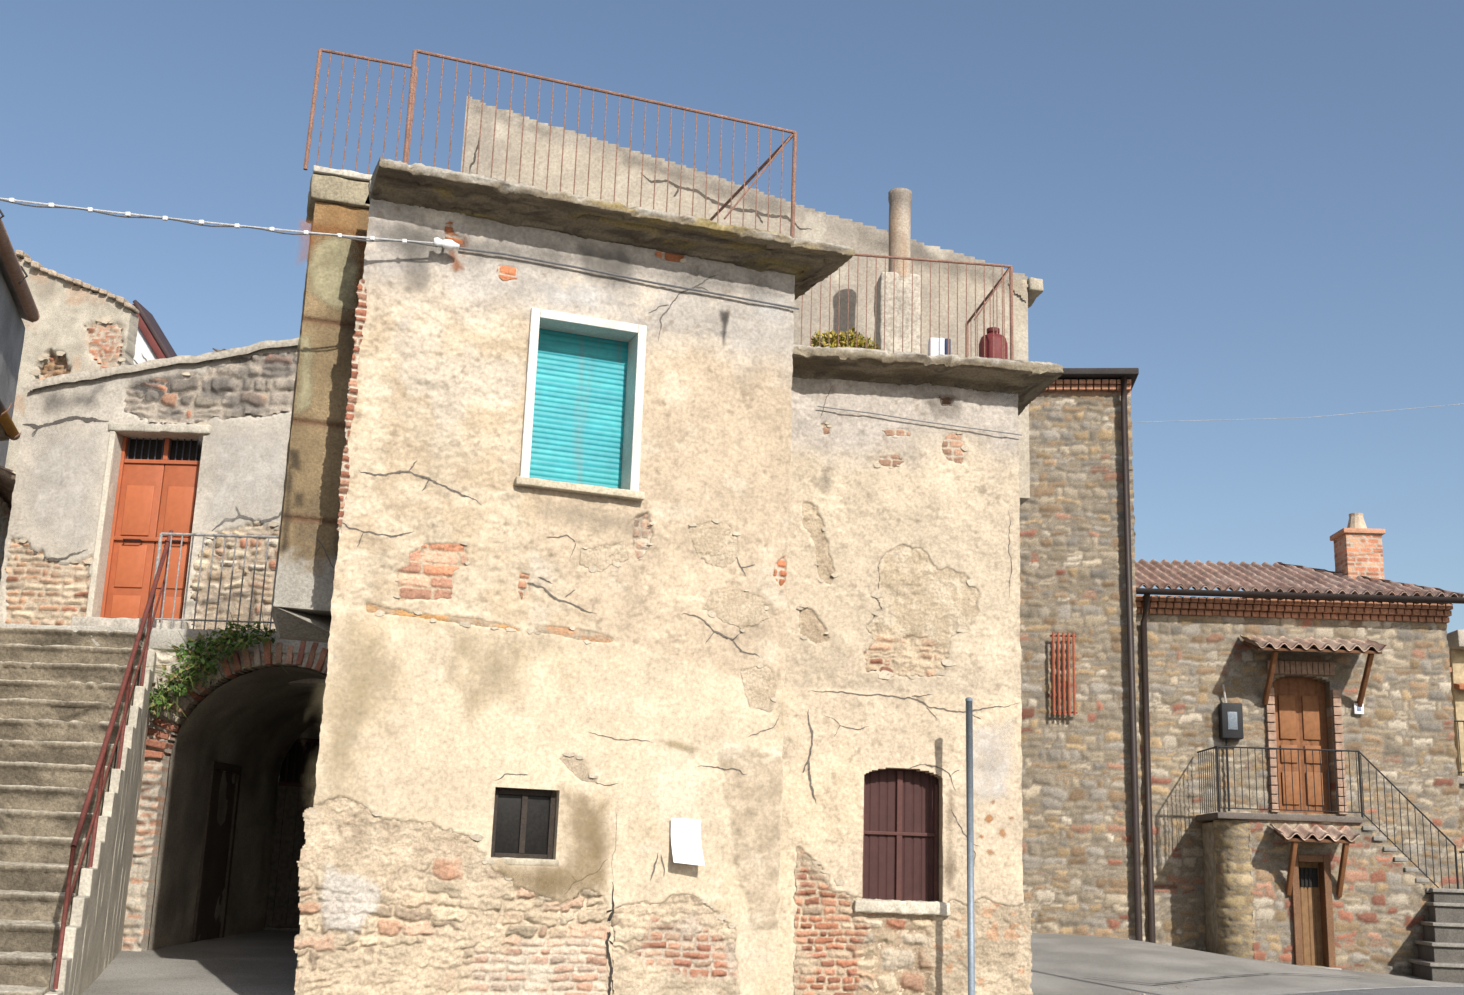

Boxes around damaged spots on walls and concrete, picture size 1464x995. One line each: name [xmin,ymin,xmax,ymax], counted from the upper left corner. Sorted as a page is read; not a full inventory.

crack [640,172,810,230]
crack [649,274,719,341]
spalling [124,338,311,425]
peeling [311,238,367,533]
spalling [5,538,93,626]
flaking render [366,541,613,644]
crack [527,534,597,614]
crack [683,613,758,656]
spalling [294,796,740,995]
crack [564,778,618,995]
crack [650,854,665,881]
spalling [793,847,1033,995]